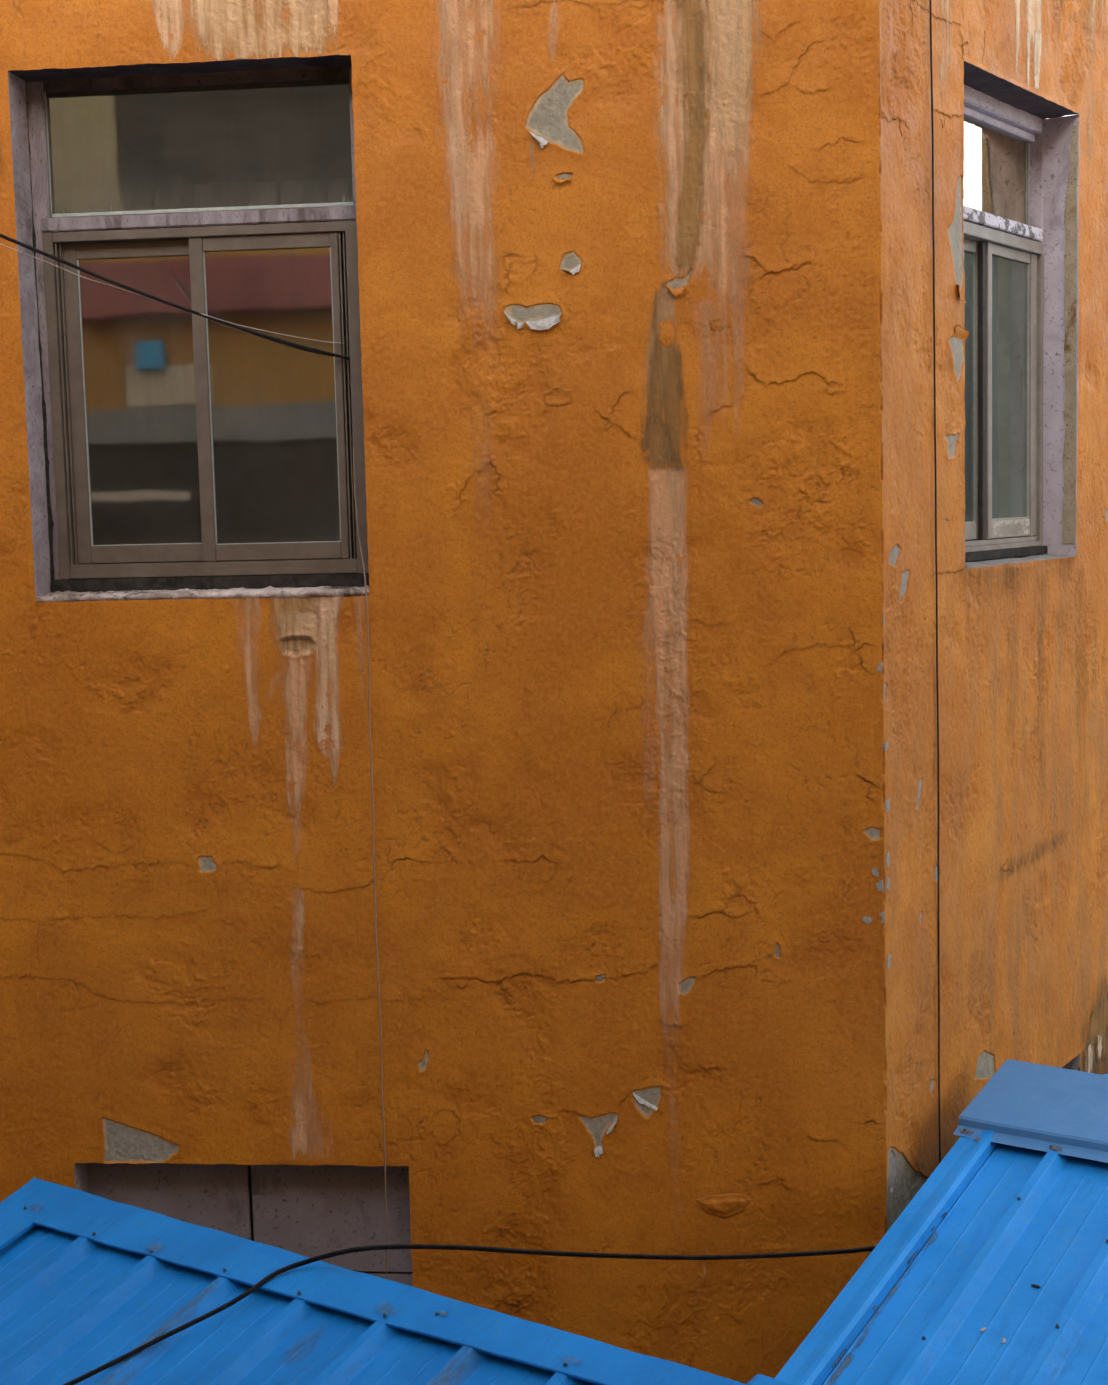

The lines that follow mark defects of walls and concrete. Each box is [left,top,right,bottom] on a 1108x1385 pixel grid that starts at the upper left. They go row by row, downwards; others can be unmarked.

leakage [154,0,338,61]
leakage [1015,0,1041,90]
peeling [526,74,584,154]
peeling [947,176,966,303]
peeling [504,304,562,330]
peeling [949,325,969,381]
leakage [642,0,752,1027]
leakage [244,596,363,832]
peeling [102,1118,179,1162]
peeling [578,1113,618,1158]
peeling [632,1087,661,1118]
peeling [886,1148,928,1231]